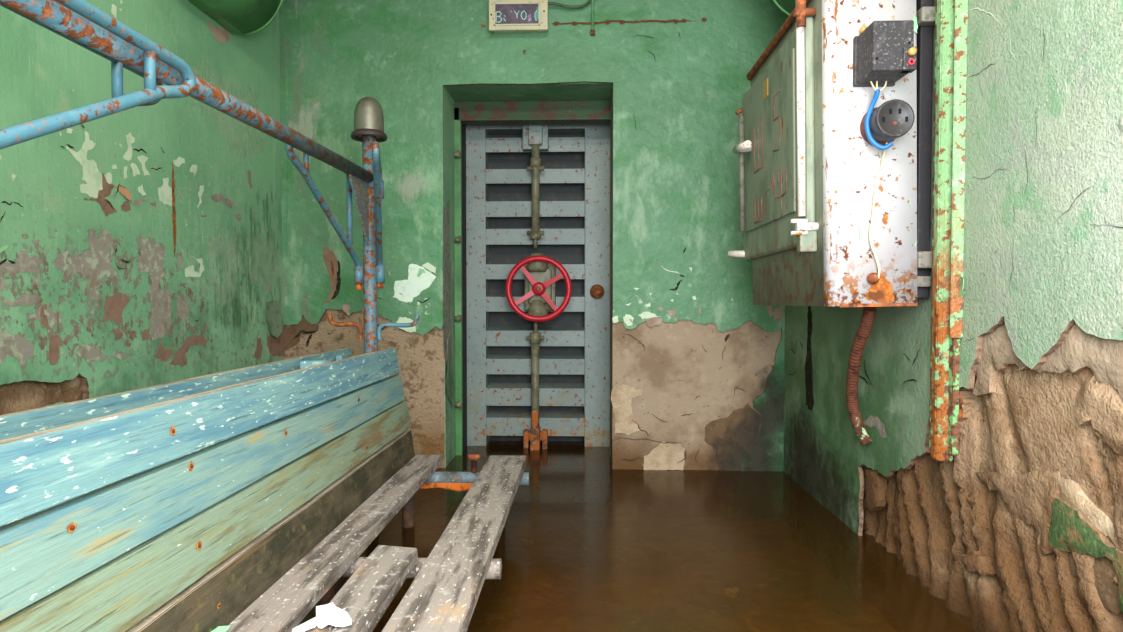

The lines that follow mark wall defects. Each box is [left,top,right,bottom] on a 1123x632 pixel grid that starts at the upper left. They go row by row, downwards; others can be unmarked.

peeling [0,128,213,367]
peeling [173,157,241,221]
flaking render [0,377,83,415]
flaking render [254,200,453,472]
flaking render [397,487,445,514]
flaking render [611,288,783,518]
leakage [718,377,850,537]
rust [959,390,975,422]
flaking render [860,322,1123,632]